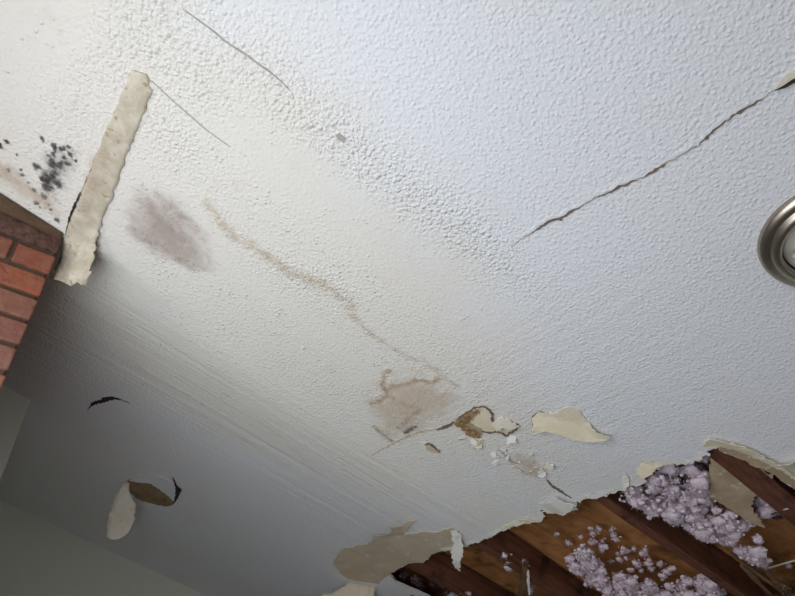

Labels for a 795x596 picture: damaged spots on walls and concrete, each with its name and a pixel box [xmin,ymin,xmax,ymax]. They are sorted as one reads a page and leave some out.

crack [512,71,795,246]
leakage [0,136,77,223]
crack [87,396,130,410]
peeling [421,442,440,453]
peeling [129,474,175,501]
peeling [622,460,663,489]
peeling [539,497,576,516]
peeling [499,519,536,531]
peeling [451,530,464,571]